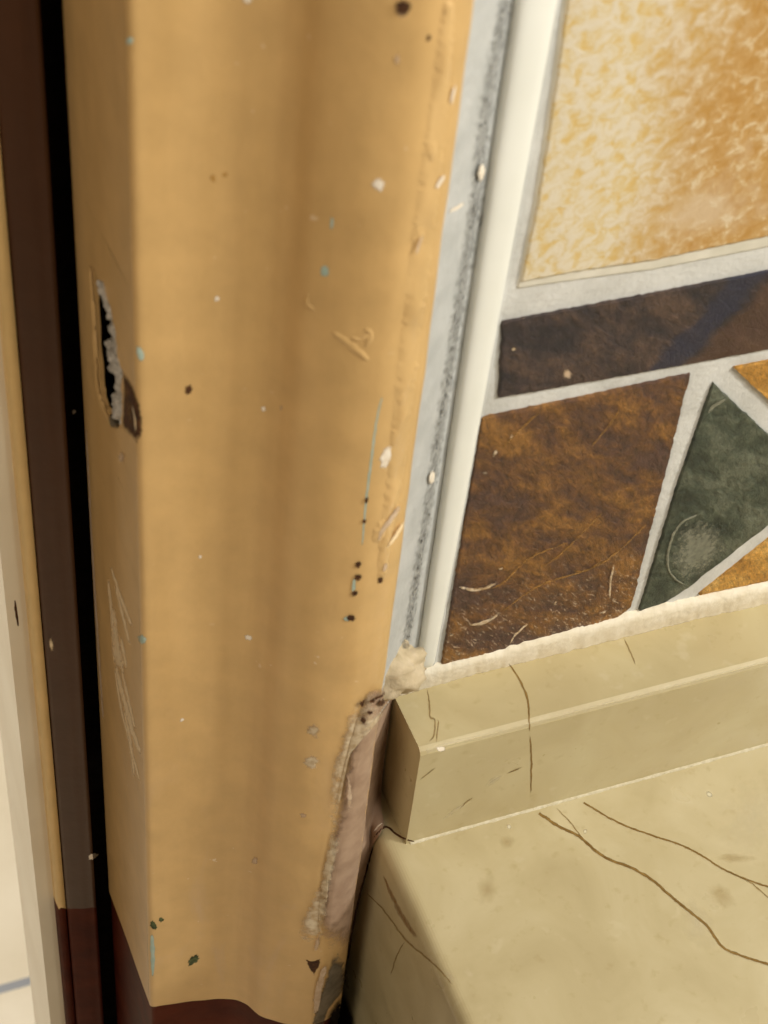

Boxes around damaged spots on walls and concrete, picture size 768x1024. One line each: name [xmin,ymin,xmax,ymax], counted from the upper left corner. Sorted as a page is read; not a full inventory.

spalling [88,266,142,438]
spalling [360,695,385,724]
crack [510,665,768,965]
spalling [306,959,320,973]
crack [348,823,450,982]